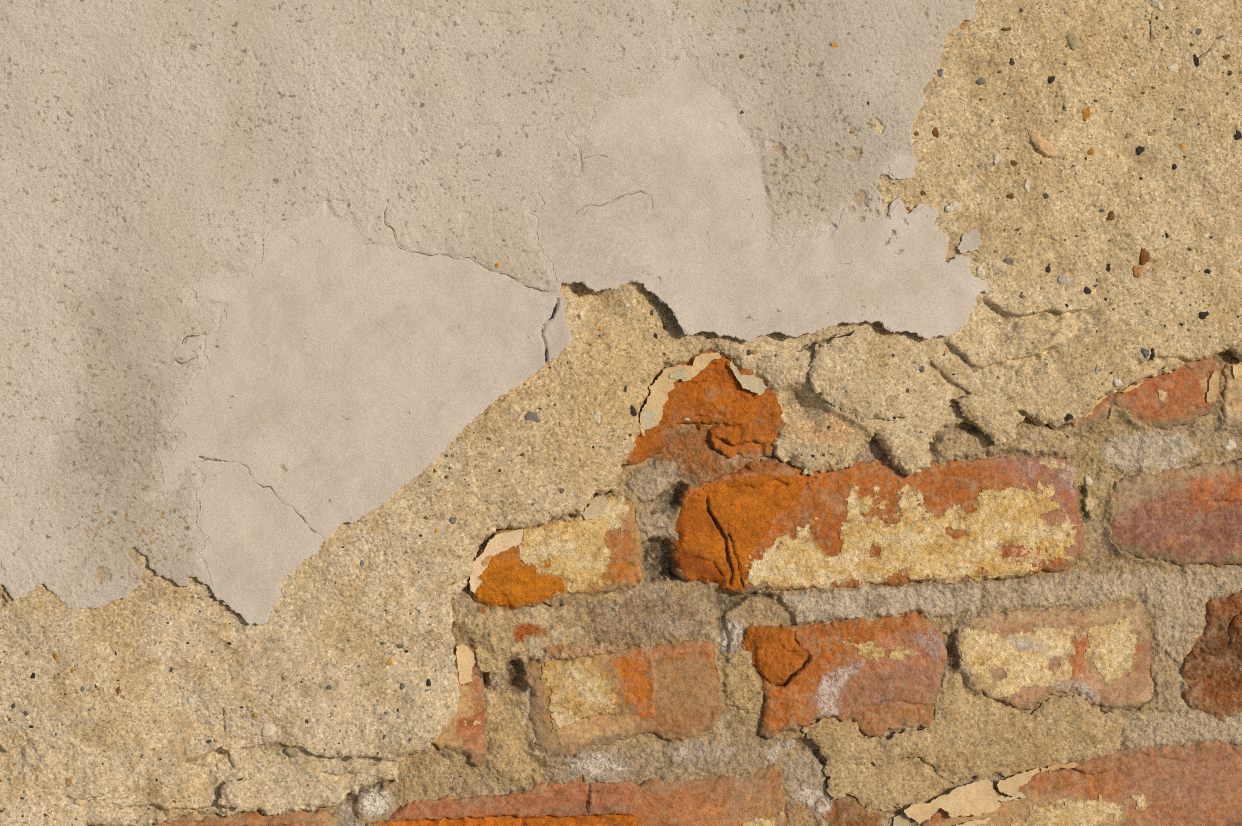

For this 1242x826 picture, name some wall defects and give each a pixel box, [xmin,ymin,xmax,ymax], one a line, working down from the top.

crack [384,205,557,362]
peeling [153,199,572,625]
peeling [640,352,722,436]
peeling [730,359,768,395]
spalling [809,333,919,422]
spalling [953,394,1025,446]
peeling [474,495,630,609]
crack [707,497,744,587]
peeling [674,474,1078,593]
peeling [541,657,621,733]
spalling [743,625,810,685]
spalling [801,617,1152,826]